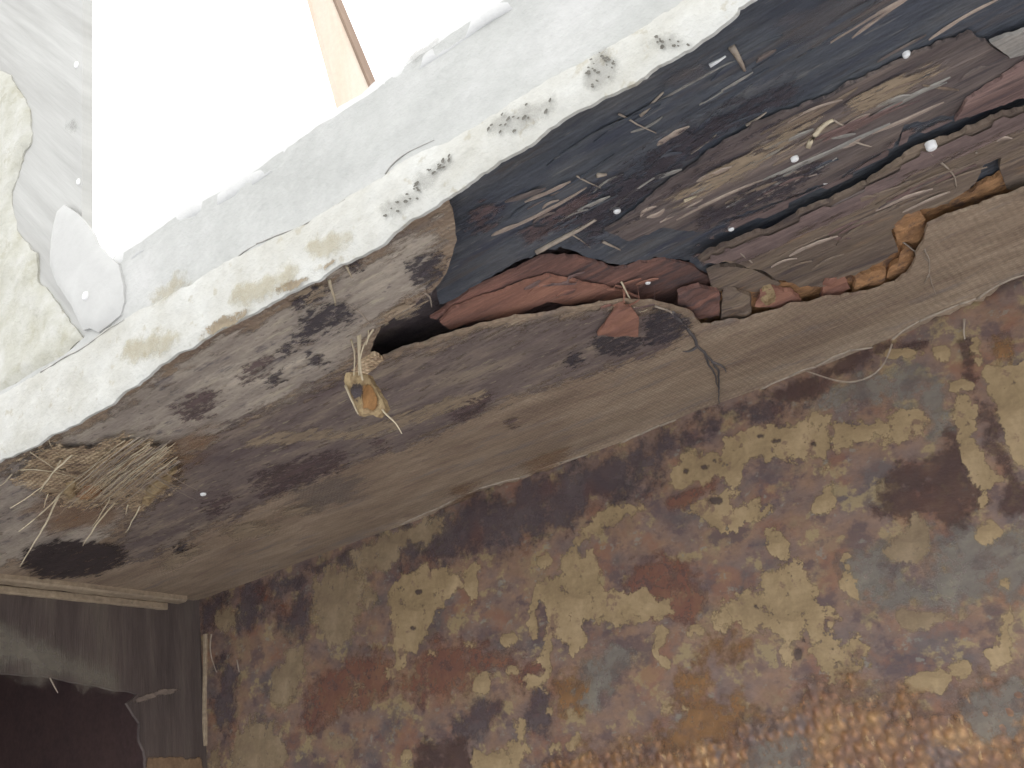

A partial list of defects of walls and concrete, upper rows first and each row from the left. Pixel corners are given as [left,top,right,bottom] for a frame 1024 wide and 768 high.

mould [584,52,615,88]
damp [379,251,451,327]
crack [671,311,727,404]
damp [113,285,694,573]
peeling [949,335,1024,546]
peeling [349,514,483,680]
peeling [500,500,676,716]
rust [623,551,707,625]
peeling [668,407,932,685]
rust [397,633,542,710]
peeling [904,657,974,695]
peeling [469,717,531,768]